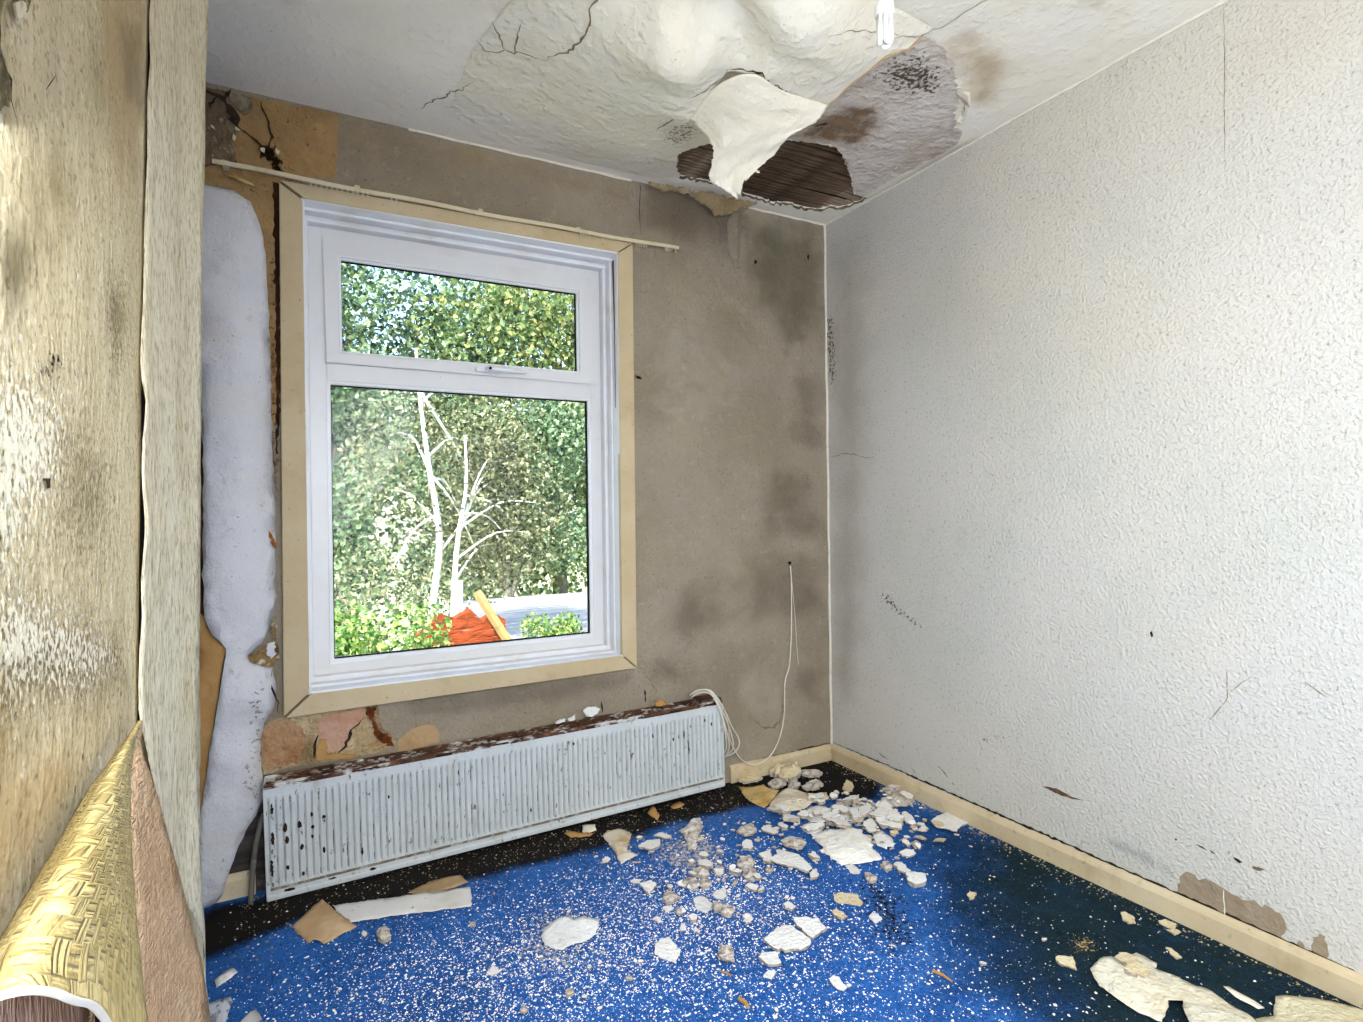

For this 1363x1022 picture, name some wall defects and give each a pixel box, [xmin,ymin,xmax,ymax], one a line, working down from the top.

crack [477,0,598,61]
crack [206,89,274,149]
crack [422,83,472,109]
damp [807,108,875,143]
flaking render [787,35,962,197]
mould [867,51,953,98]
crack [272,182,281,465]
flaking render [229,705,439,892]
peeling [1177,872,1329,958]